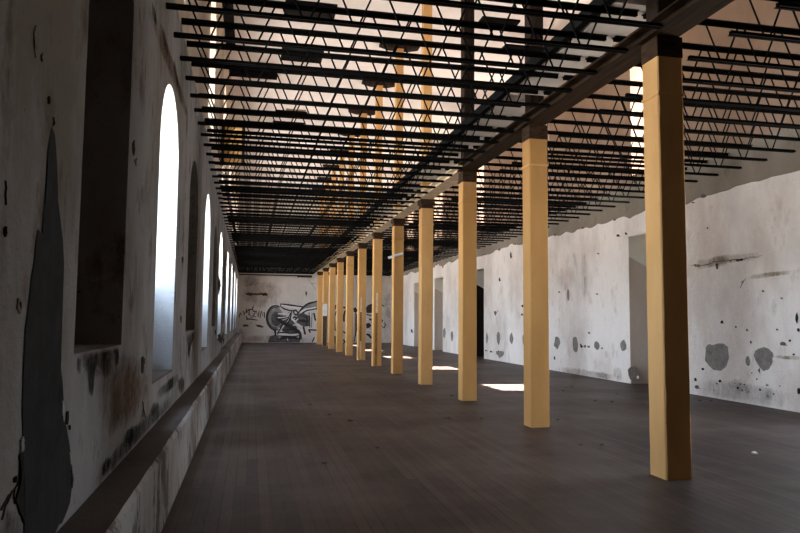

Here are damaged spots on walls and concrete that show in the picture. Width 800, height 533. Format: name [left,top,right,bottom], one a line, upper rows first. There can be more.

crack [688,255,762,288]
leakage [77,351,119,394]
leakage [162,377,184,393]
spalling [573,337,603,352]
spalling [701,343,731,384]
spalling [745,341,780,397]
leakage [102,403,162,474]